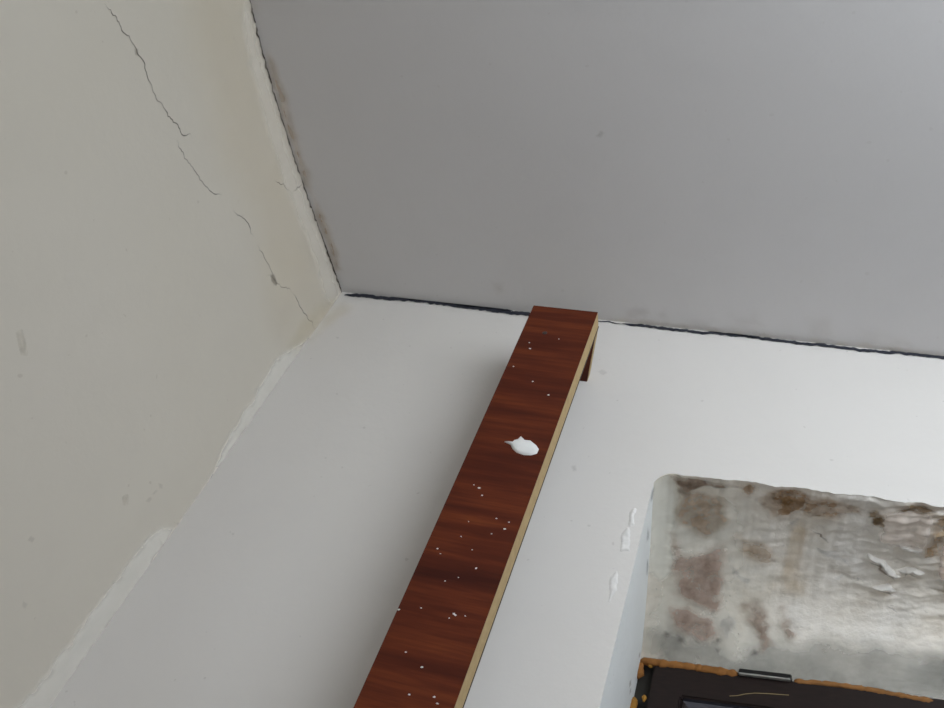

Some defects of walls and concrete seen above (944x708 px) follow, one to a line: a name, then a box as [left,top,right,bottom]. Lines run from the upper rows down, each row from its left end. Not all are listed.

crack [598,321,944,359]
spalling [673,478,754,535]
spalling [764,490,840,518]
spalling [672,550,722,640]
spalling [752,610,769,648]
leakage [661,633,944,698]